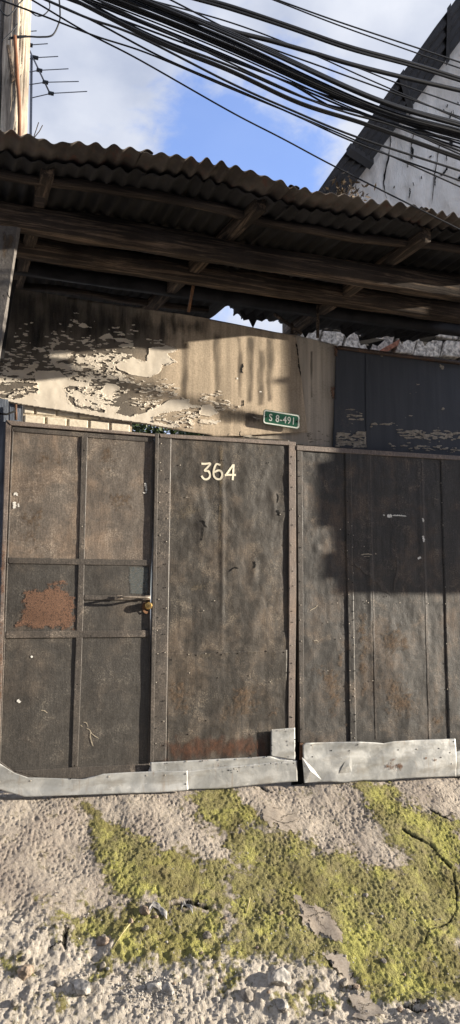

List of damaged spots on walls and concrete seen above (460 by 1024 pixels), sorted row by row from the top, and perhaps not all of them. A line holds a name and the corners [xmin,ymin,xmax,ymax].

peeling [0,313,241,429]
peeling [307,409,460,453]
corrosion [15,580,76,630]